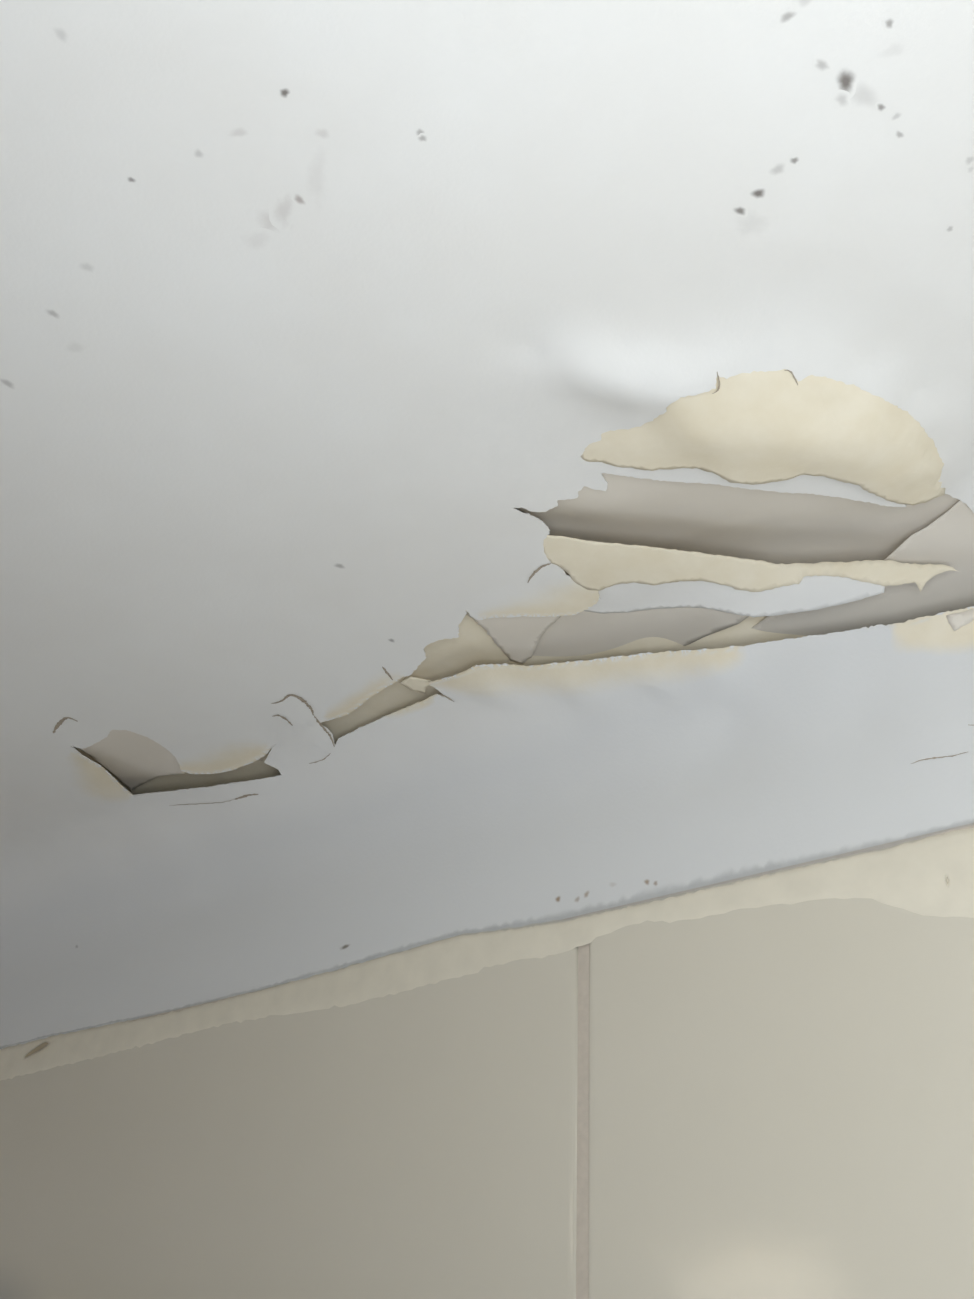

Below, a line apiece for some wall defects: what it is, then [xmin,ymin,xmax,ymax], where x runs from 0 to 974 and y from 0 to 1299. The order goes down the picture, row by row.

leakage [777,0,816,26]
leakage [278,86,293,100]
leakage [811,56,906,140]
leakage [237,126,333,254]
leakage [729,155,801,242]
peeling [45,369,974,819]